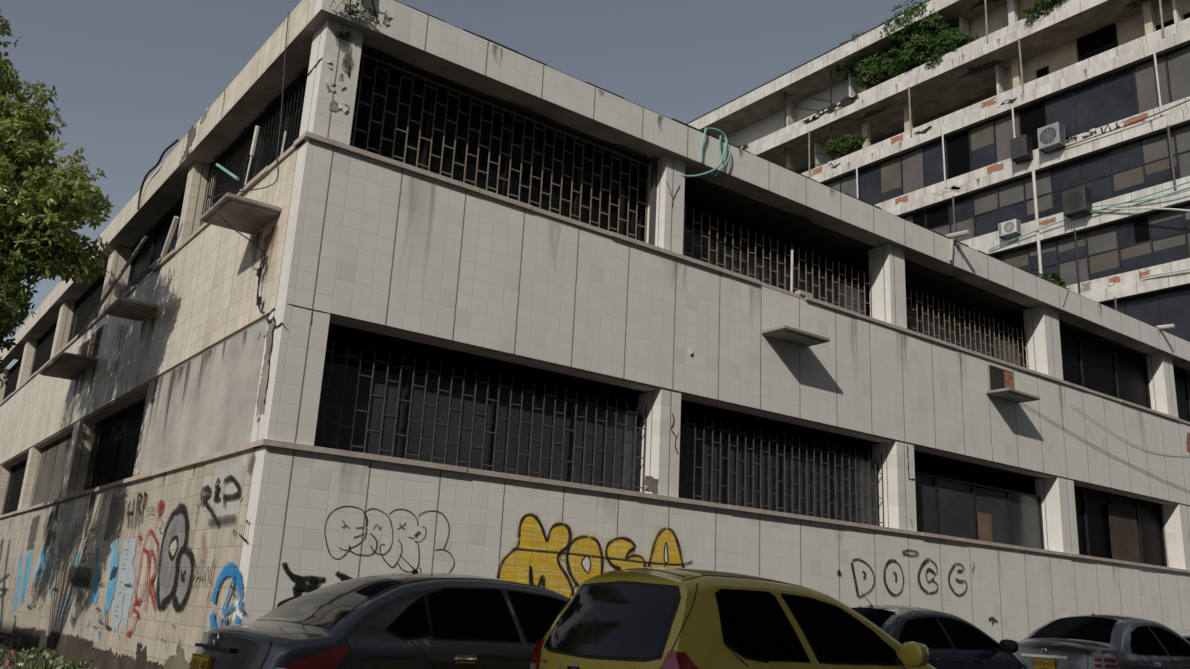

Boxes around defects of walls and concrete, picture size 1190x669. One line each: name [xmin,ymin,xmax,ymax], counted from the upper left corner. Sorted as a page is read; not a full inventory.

spalling [344,3,392,26]
peeling [325,58,350,113]
spalling [0,612,190,669]